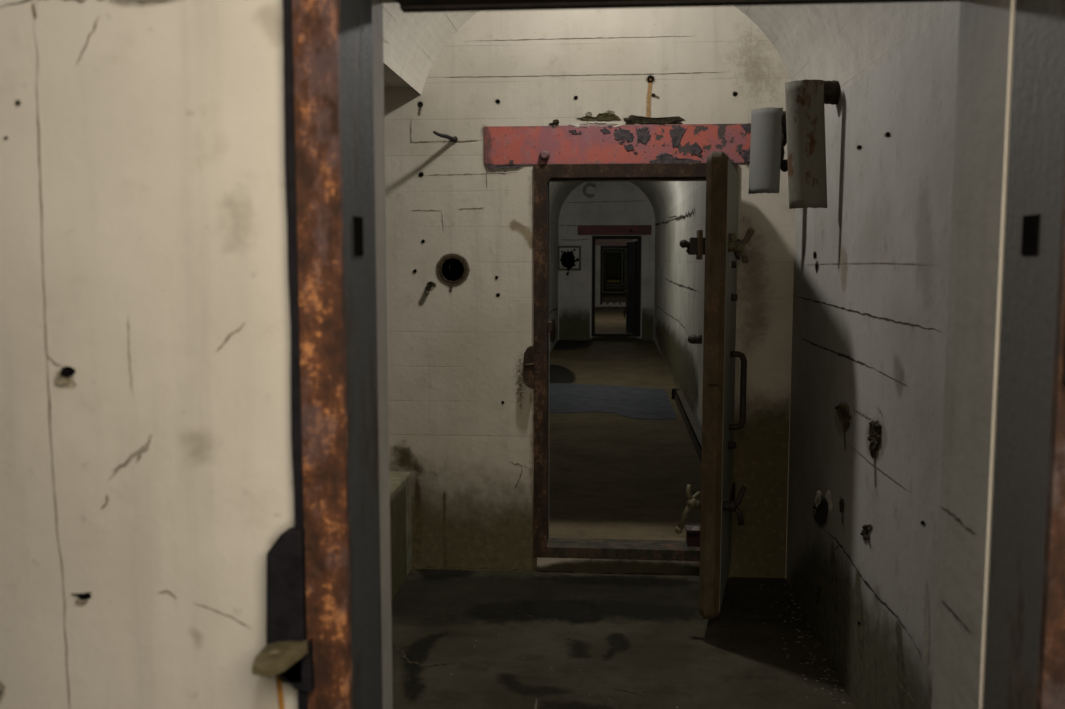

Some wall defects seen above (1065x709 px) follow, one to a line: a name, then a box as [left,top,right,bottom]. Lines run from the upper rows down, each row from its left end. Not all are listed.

crack [63,0,102,65]
peeling [486,160,526,172]
spalling [549,110,705,163]
crack [0,0,70,709]
crack [803,339,905,385]
spalling [835,403,851,451]
spalling [867,420,881,486]
water stain [390,447,700,603]
water stain [728,402,932,709]
spalling [860,524,872,548]
water stain [474,601,689,622]
crack [823,528,921,657]